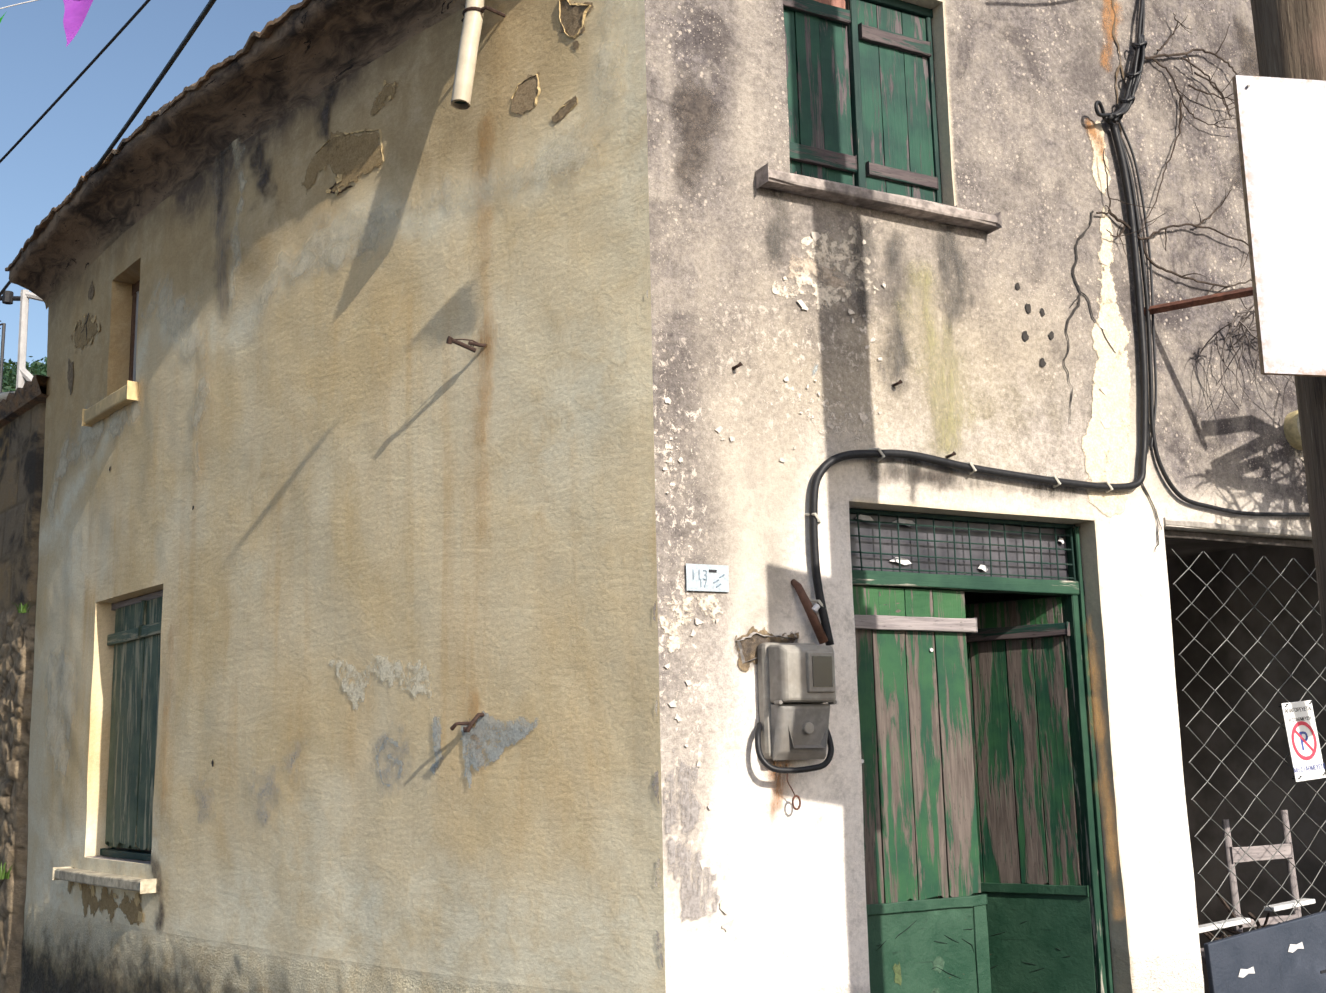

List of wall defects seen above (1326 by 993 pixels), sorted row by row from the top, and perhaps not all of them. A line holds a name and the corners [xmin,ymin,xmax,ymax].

spalling [558,0,593,49]
rust [1102,0,1119,66]
leakage [319,81,335,136]
peeling [302,80,396,196]
spalling [511,72,541,115]
spalling [552,96,578,123]
leakage [675,87,717,182]
leakage [216,139,270,307]
peeling [772,225,886,360]
crack [1064,210,1116,416]
peeling [68,881,143,926]